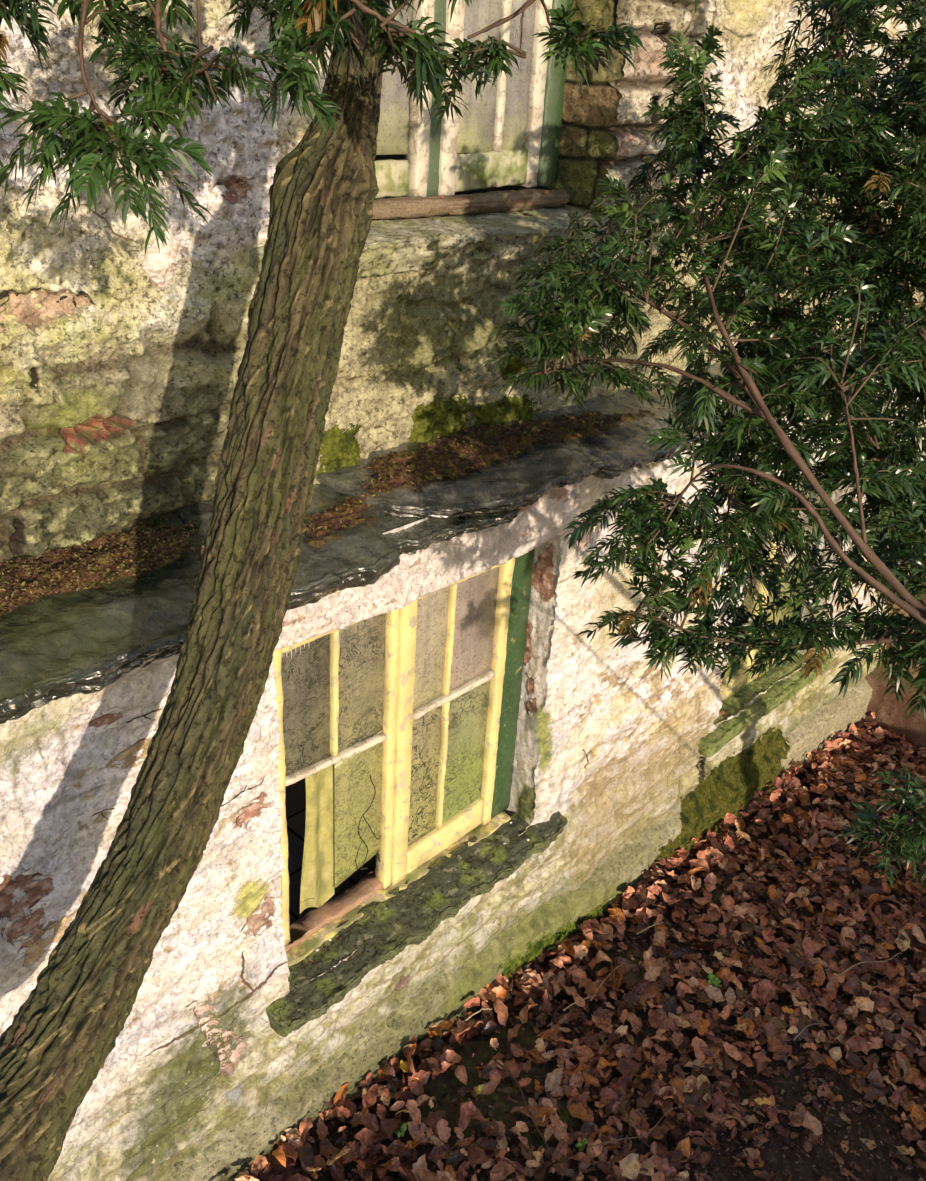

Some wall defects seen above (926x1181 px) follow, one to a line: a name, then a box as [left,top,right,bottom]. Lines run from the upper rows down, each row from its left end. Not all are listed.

spalling [212,175,257,204]
spalling [0,283,97,333]
peeling [233,792,271,831]
spalling [0,868,77,967]
damp [126,990,246,1179]